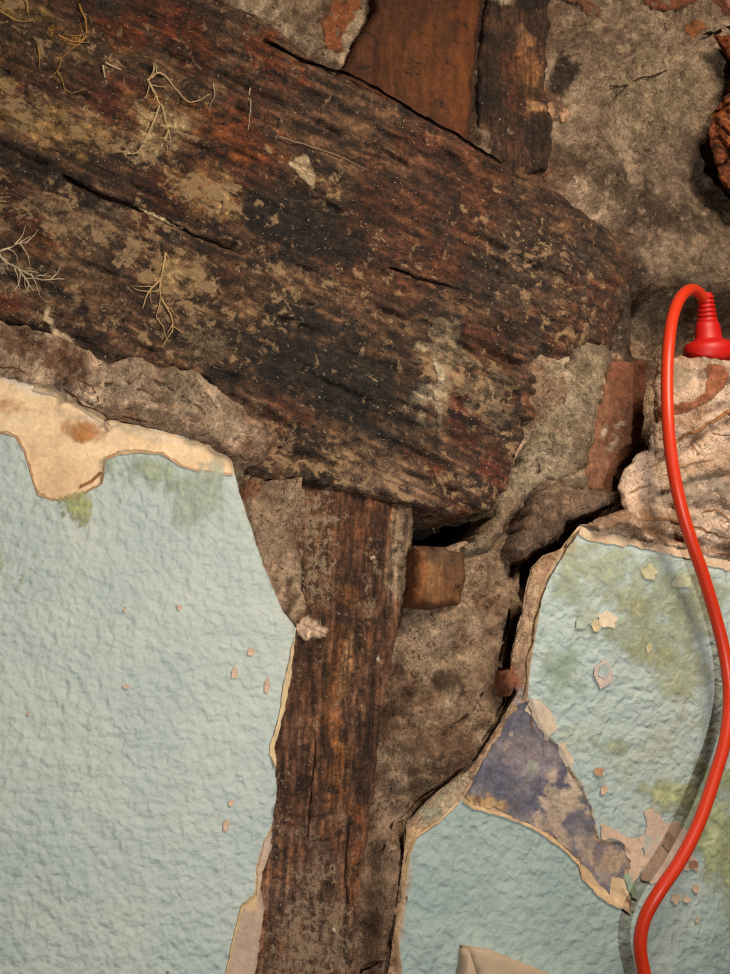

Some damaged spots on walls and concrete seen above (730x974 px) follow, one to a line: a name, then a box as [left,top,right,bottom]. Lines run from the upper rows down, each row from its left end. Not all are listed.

water stain [65,422,106,443]
peeling [0,378,234,500]
crack [629,409,730,494]
water stain [556,543,711,696]
crack [643,508,730,557]
peeling [703,555,730,571]
peeling [269,638,295,766]
crack [360,527,582,974]
peeling [388,526,692,974]
water stain [639,758,710,831]
water stain [694,769,730,898]
peeling [226,832,272,974]